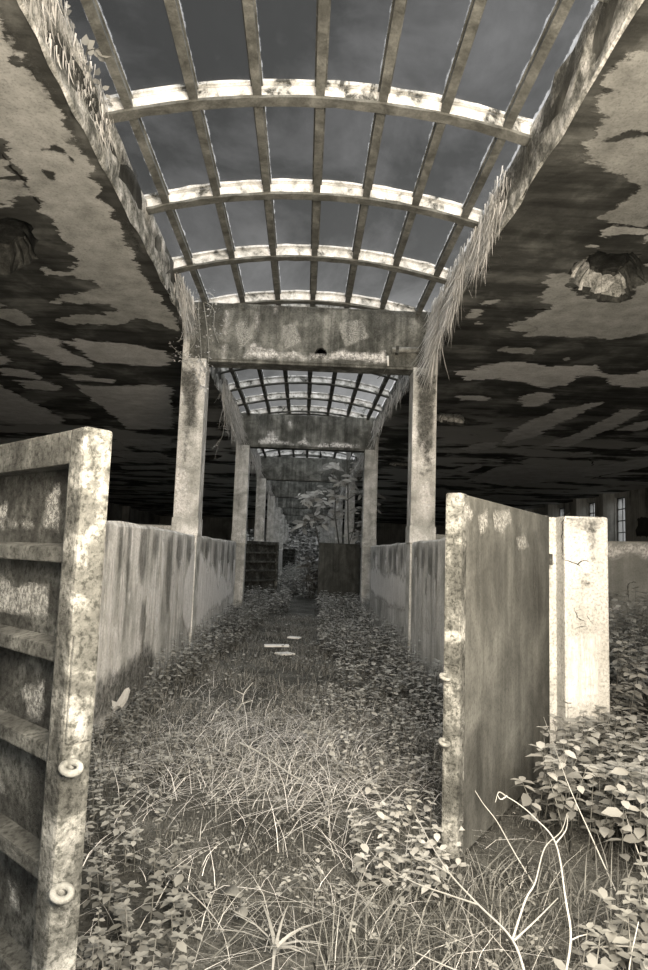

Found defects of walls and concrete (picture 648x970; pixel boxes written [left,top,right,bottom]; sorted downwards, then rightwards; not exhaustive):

peeling [0,19,180,331]
peeling [453,49,648,487]
peeling [0,303,179,470]
spalling [437,413,470,426]
water stain [107,527,235,665]
water stain [371,550,436,631]